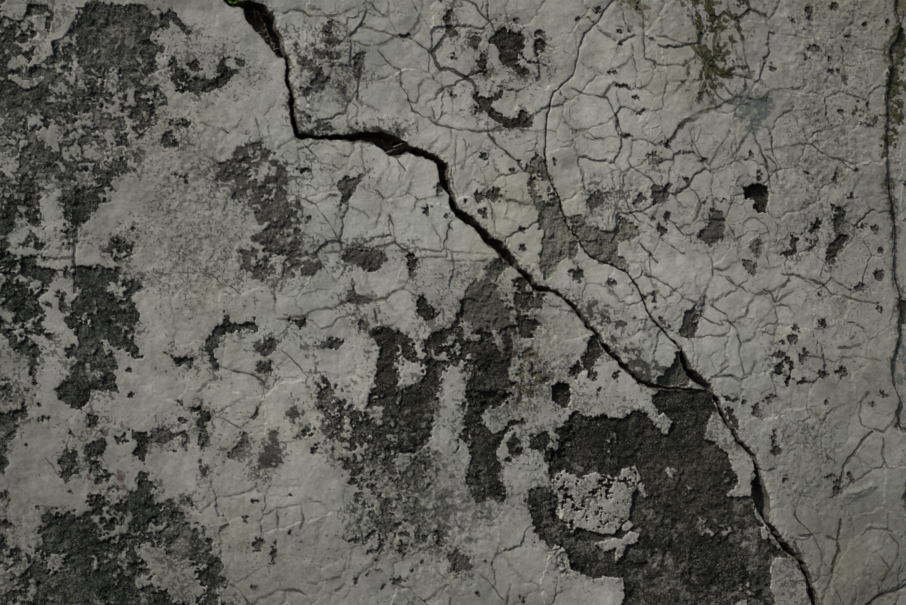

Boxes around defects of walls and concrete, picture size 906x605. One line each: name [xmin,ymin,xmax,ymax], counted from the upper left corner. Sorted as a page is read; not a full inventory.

crack [183,117,260,146]
peeling [207,142,322,282]
spalling [743,170,769,214]
spalling [51,266,73,279]
spalling [43,290,70,314]
peeling [456,258,513,335]
crack [224,0,906,605]
crack [215,366,265,438]
spalling [742,394,777,420]
spalling [768,429,782,456]